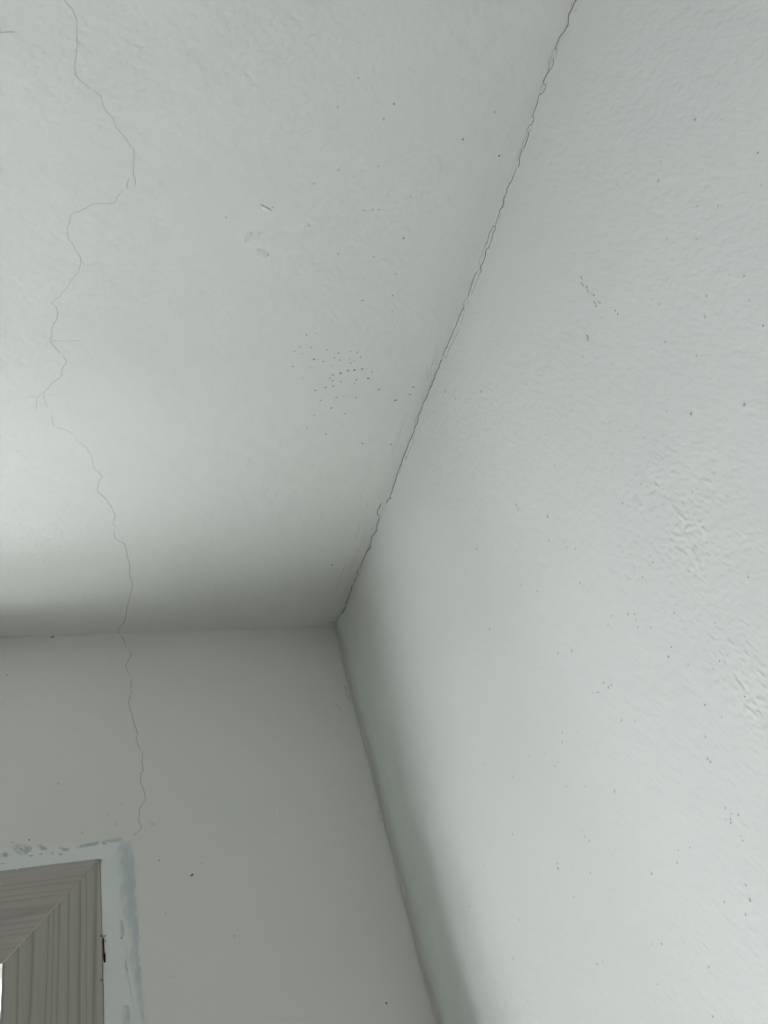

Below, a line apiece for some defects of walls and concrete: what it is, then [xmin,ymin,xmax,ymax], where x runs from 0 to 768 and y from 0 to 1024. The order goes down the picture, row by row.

crack [330,0,577,623]